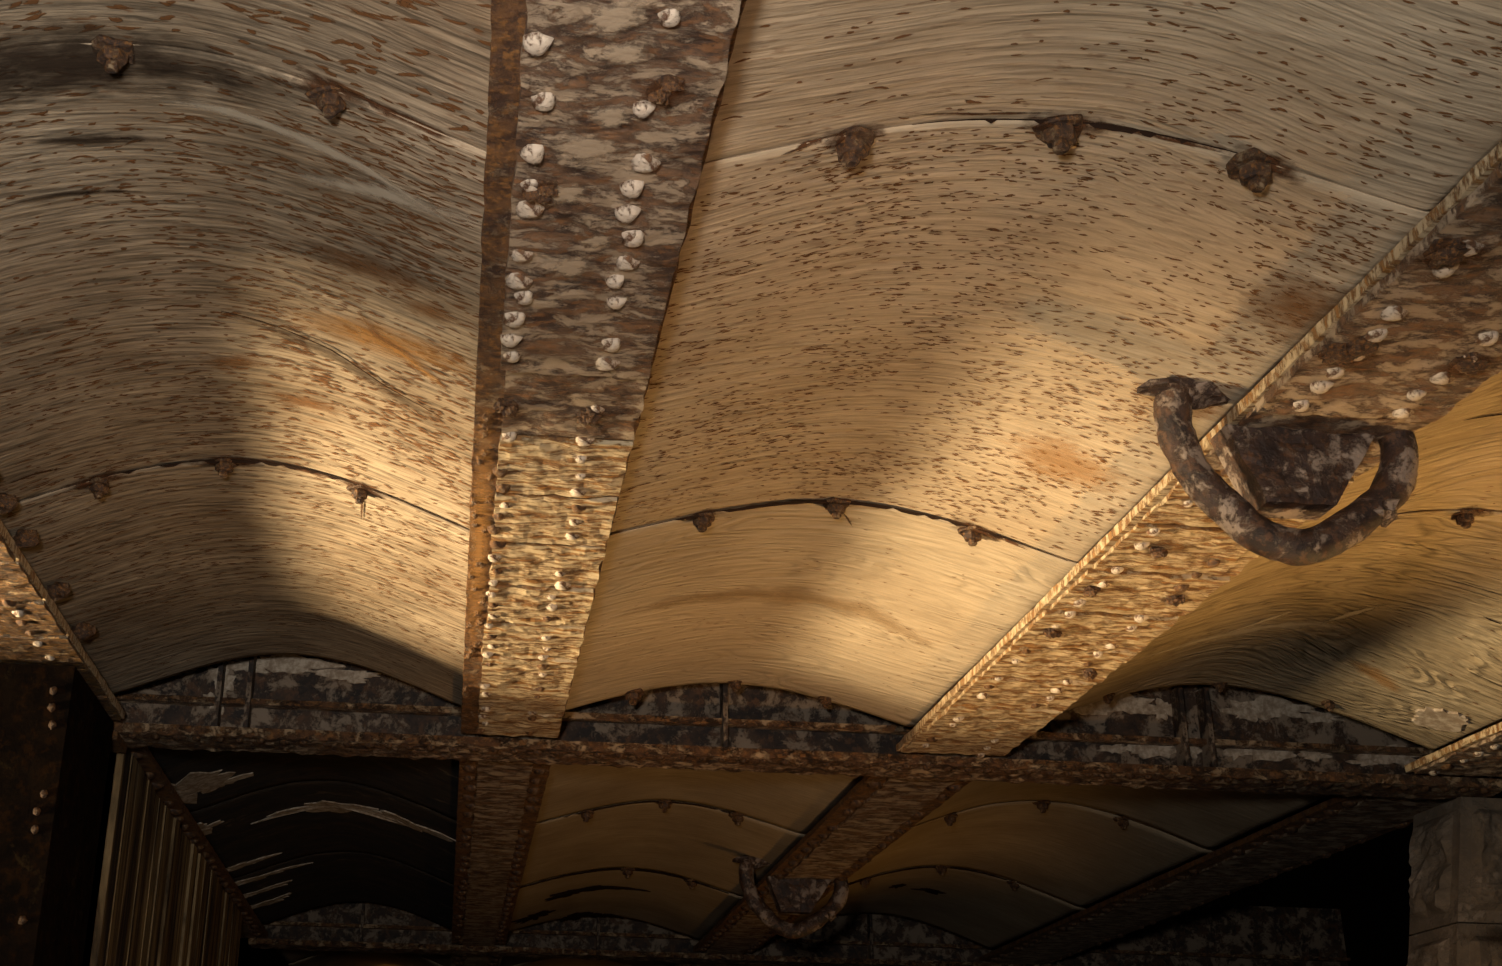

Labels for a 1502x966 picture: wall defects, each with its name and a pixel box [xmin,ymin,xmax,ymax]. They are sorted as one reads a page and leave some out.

rust [520,180,560,205]
rust [613,1,1502,550]
rust [576,407,607,426]
rust [1148,546,1168,559]
rust [1082,585,1103,598]
rust [1040,628,1062,639]
rust [1143,595,1186,677]
rust [1080,668,1098,681]